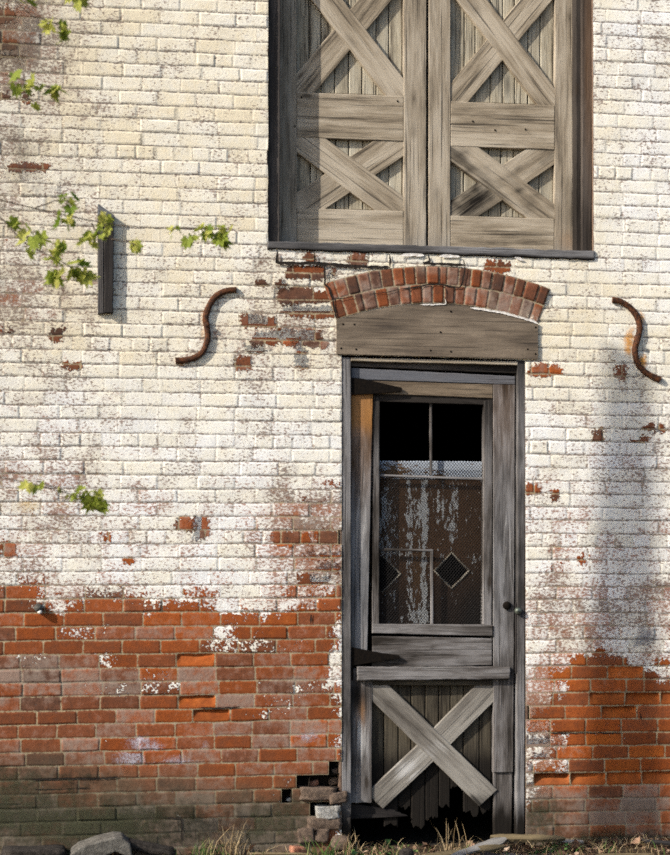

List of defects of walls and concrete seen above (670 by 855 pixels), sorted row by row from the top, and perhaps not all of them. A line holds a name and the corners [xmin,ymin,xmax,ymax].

peeling [0,0,24,24]
peeling [0,35,27,59]
peeling [0,90,35,105]
peeling [5,159,51,175]
peeling [483,258,511,275]
peeling [233,251,339,374]
peeling [48,324,66,343]
peeling [60,357,85,371]
peeling [526,362,564,378]
peeling [173,515,211,542]
peeling [0,527,342,855]
peeling [526,646,670,845]